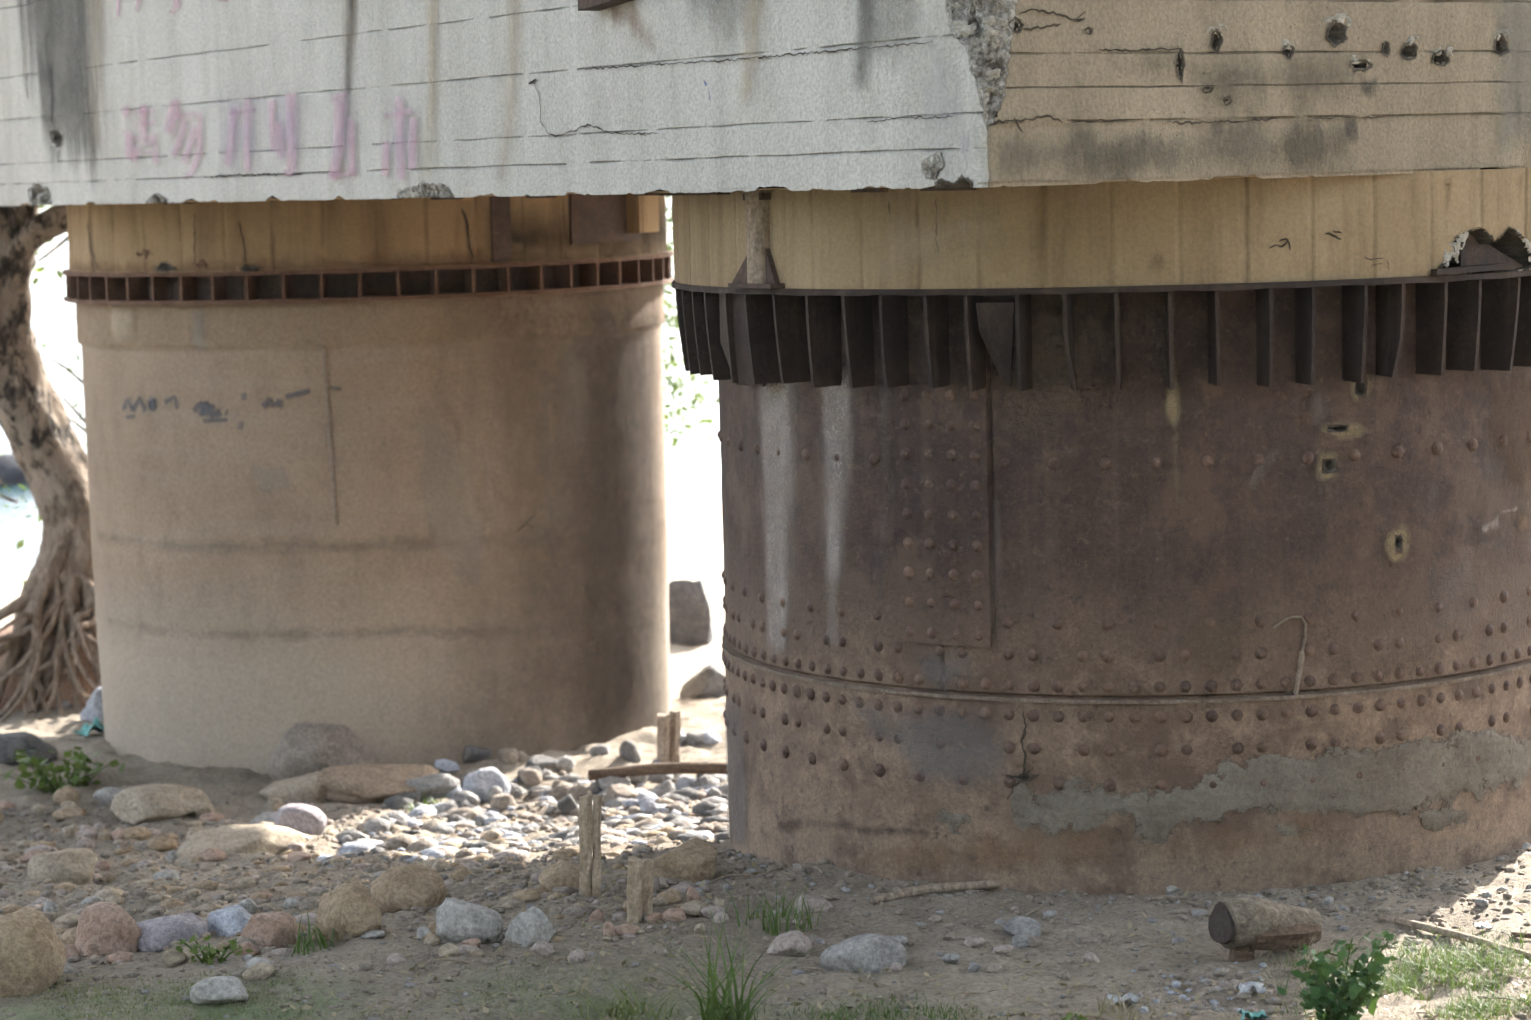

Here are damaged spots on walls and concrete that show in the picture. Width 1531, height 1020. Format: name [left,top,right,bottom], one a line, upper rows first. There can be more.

damp [19,0,99,159]
spalling [946,0,1024,133]
spalling [1176,49,1186,83]
spalling [1207,22,1227,53]
spalling [1282,39,1297,60]
spalling [1323,13,1453,73]
spalling [1494,28,1514,56]
spalling [1431,227,1531,275]
corrosion [1166,368,1179,424]
corrosion [1318,423,1364,480]
corrosion [1386,526,1409,562]
crack [1005,711,1039,800]